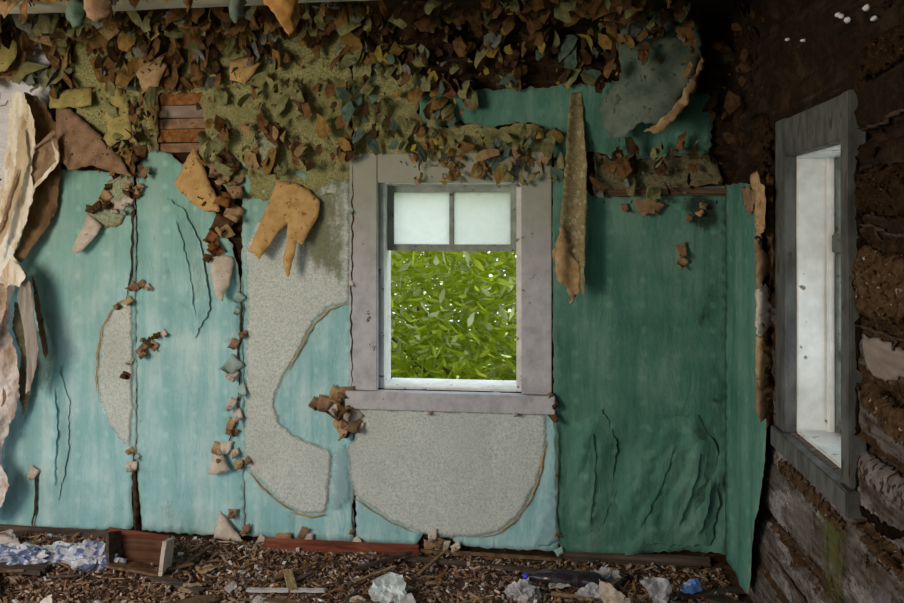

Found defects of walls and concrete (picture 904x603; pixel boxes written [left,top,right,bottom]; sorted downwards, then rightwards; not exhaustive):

peeling [0,0,696,518]
peeling [589,130,722,204]
peeling [750,167,774,429]
peeling [347,409,559,547]